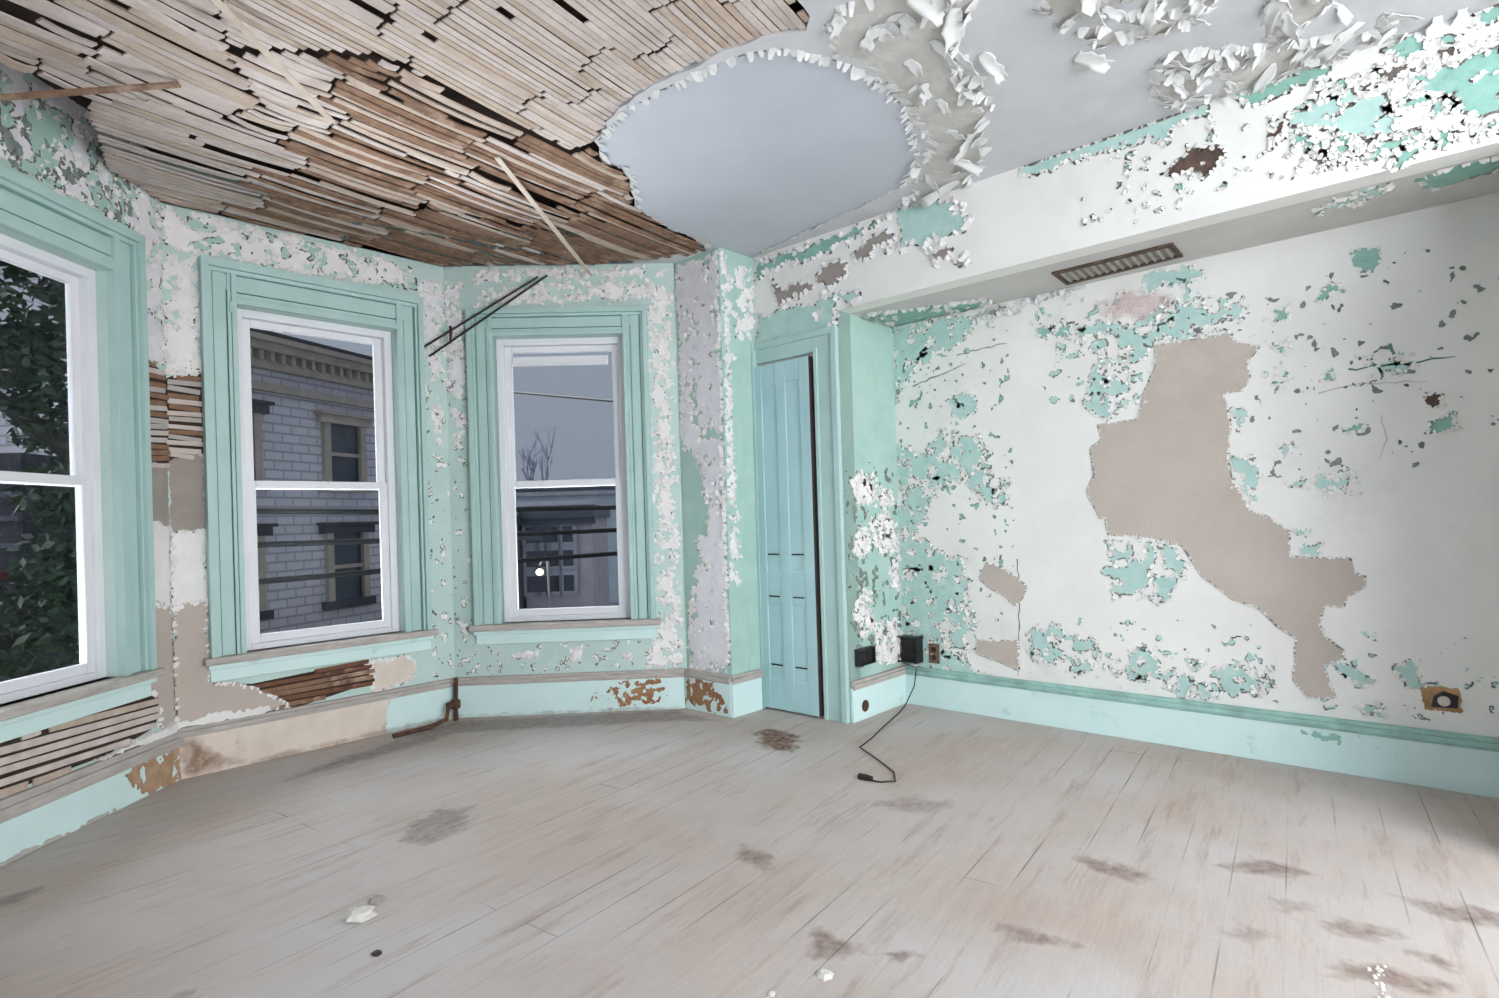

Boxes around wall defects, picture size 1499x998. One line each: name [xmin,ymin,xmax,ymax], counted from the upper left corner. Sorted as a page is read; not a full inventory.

spalling [0,0,1499,760]
corrosion [591,678,667,709]
corrosion [685,678,728,714]